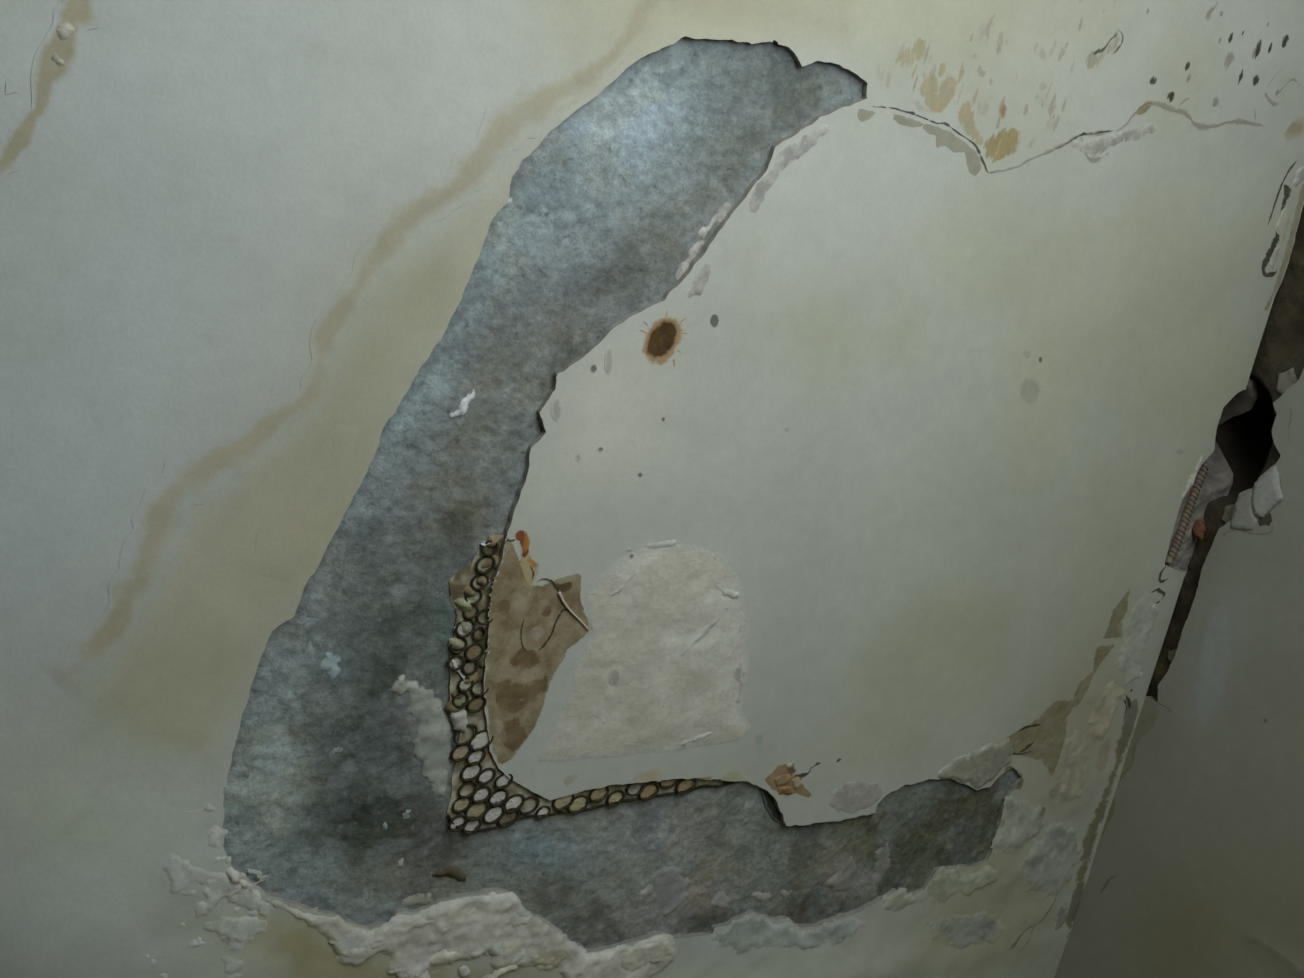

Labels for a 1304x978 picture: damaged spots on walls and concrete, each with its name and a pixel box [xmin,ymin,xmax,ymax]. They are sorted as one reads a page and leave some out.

water stain [0,0,101,181]
water stain [36,0,866,787]
spalling [162,0,1130,978]
rust [640,310,688,367]
crack [857,67,1304,311]
spalling [1123,205,1304,714]